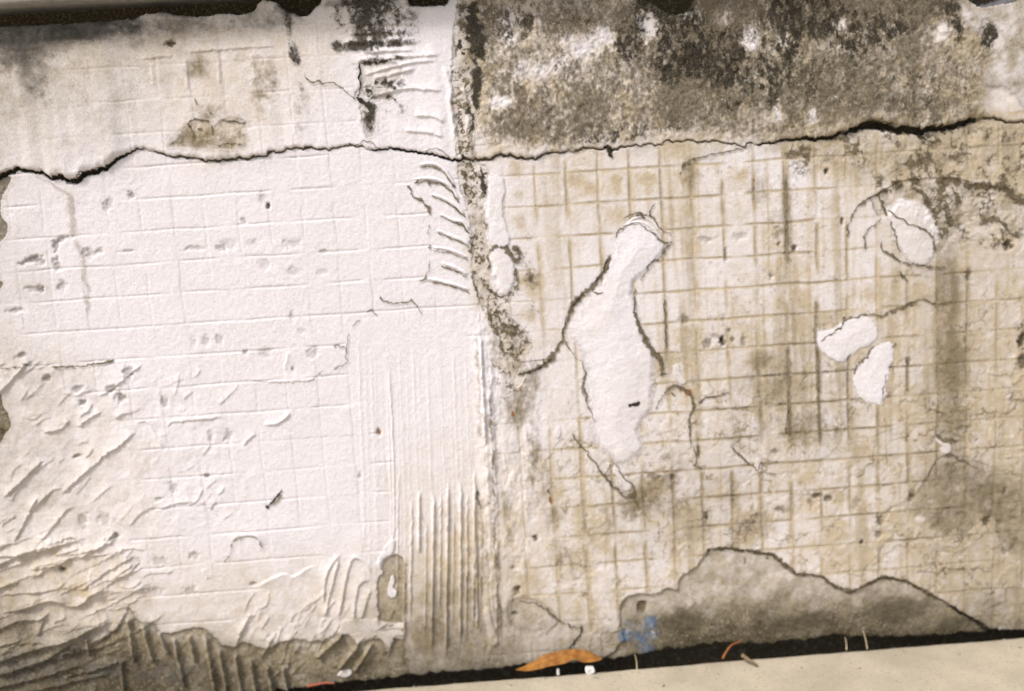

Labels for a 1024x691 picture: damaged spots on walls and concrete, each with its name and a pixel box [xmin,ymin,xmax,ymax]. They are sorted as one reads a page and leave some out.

damp [44,20,141,41]
damp [332,0,418,62]
damp [363,80,405,132]
crack [0,117,1024,184]
damp [478,0,998,148]
spalling [784,145,811,173]
spalling [870,128,1024,252]
crack [518,204,729,507]
crack [785,188,951,442]
spalling [0,539,409,691]
spalling [603,548,988,659]
crack [705,547,989,630]